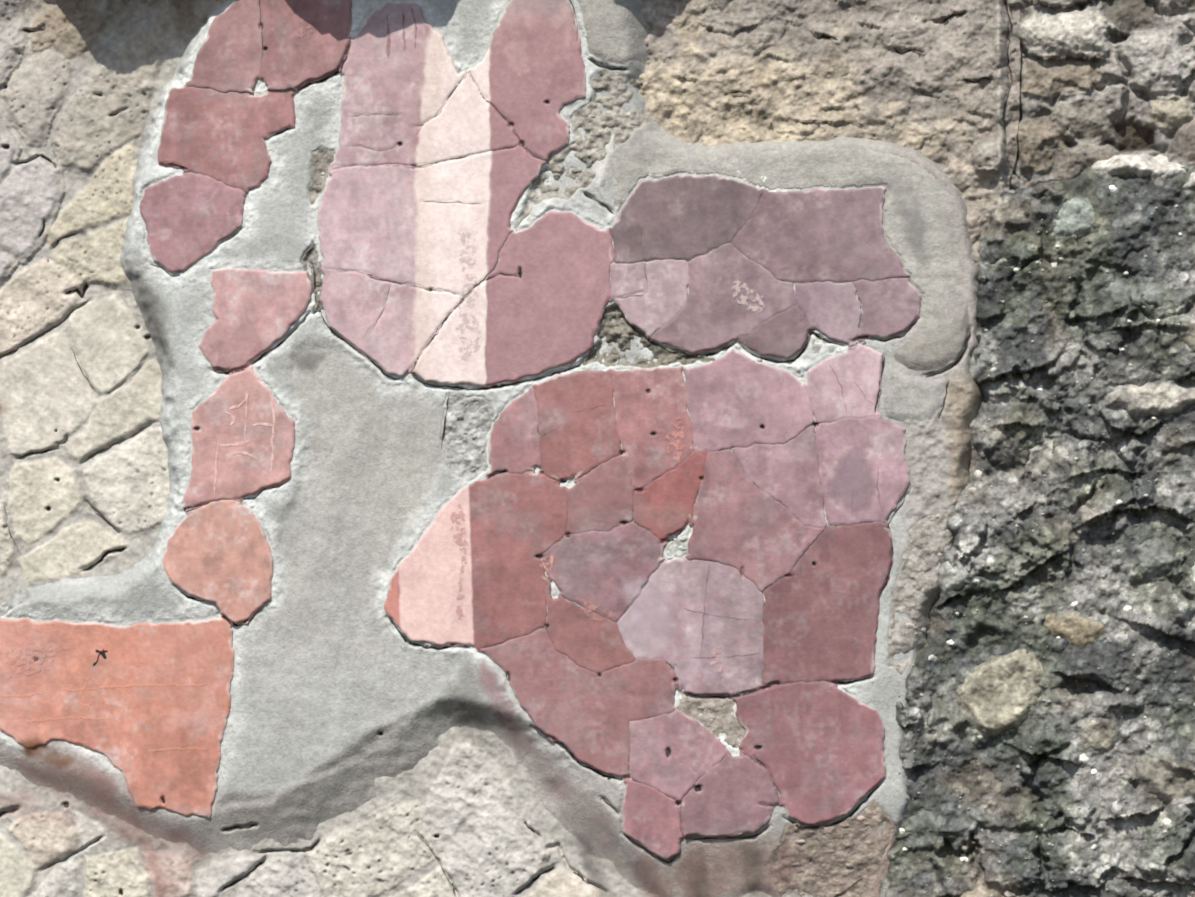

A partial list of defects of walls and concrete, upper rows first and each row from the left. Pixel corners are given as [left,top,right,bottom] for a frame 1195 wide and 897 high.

crack [333,72,538,168]
spalling [514,69,656,229]
crack [964,0,1021,179]
crack [213,248,592,449]
damp [581,838,598,877]